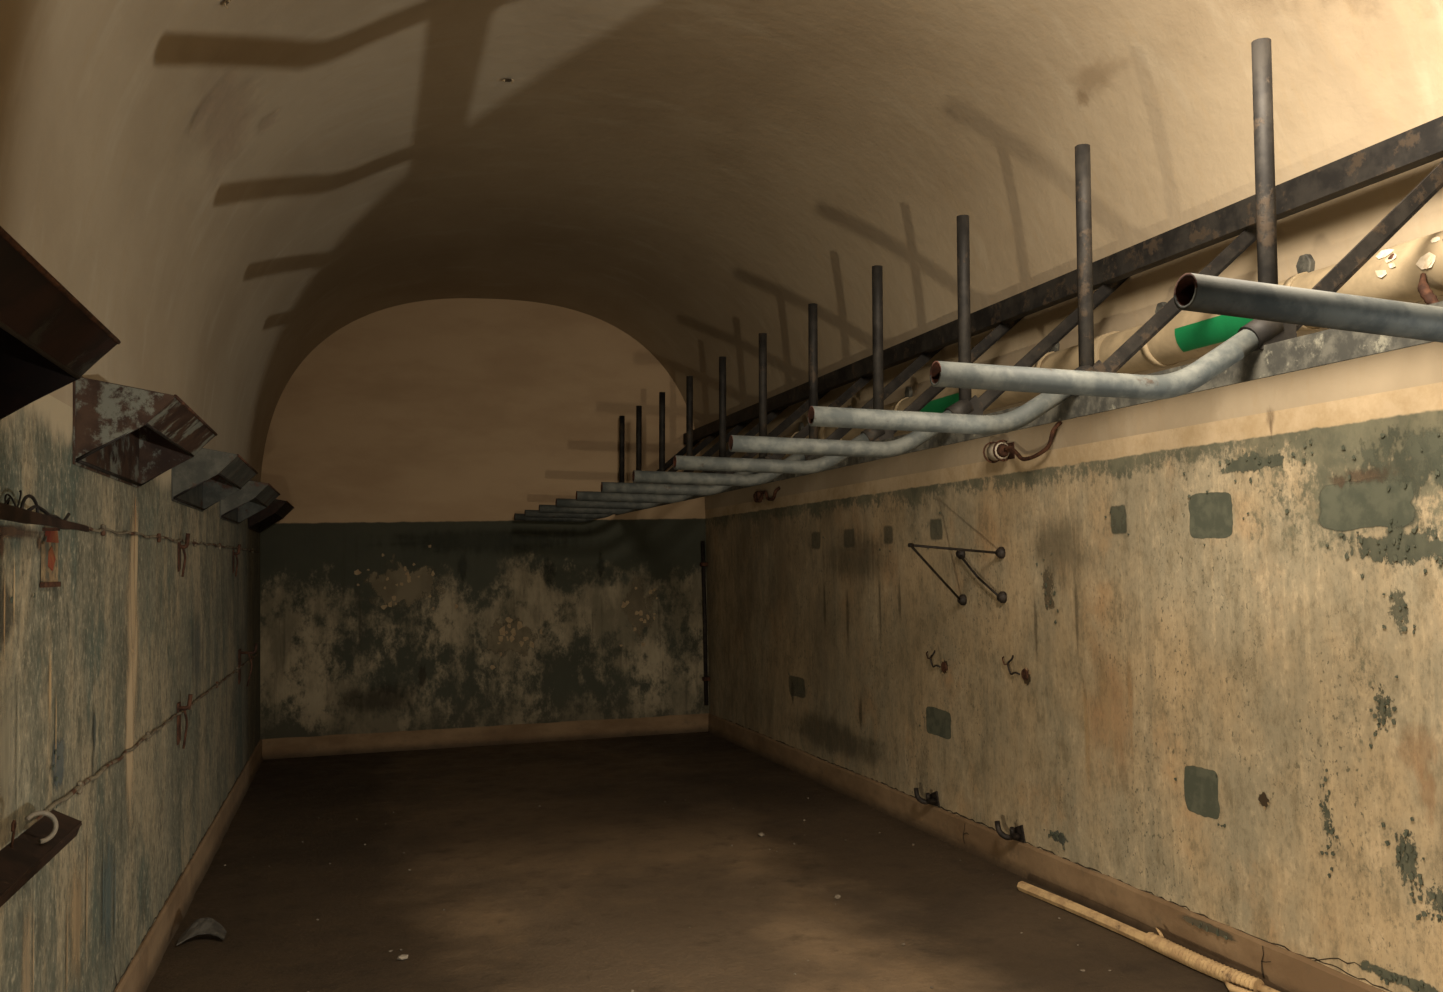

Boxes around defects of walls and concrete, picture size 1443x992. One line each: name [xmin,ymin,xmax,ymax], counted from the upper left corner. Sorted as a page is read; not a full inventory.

peeling [1336,428,1443,500]